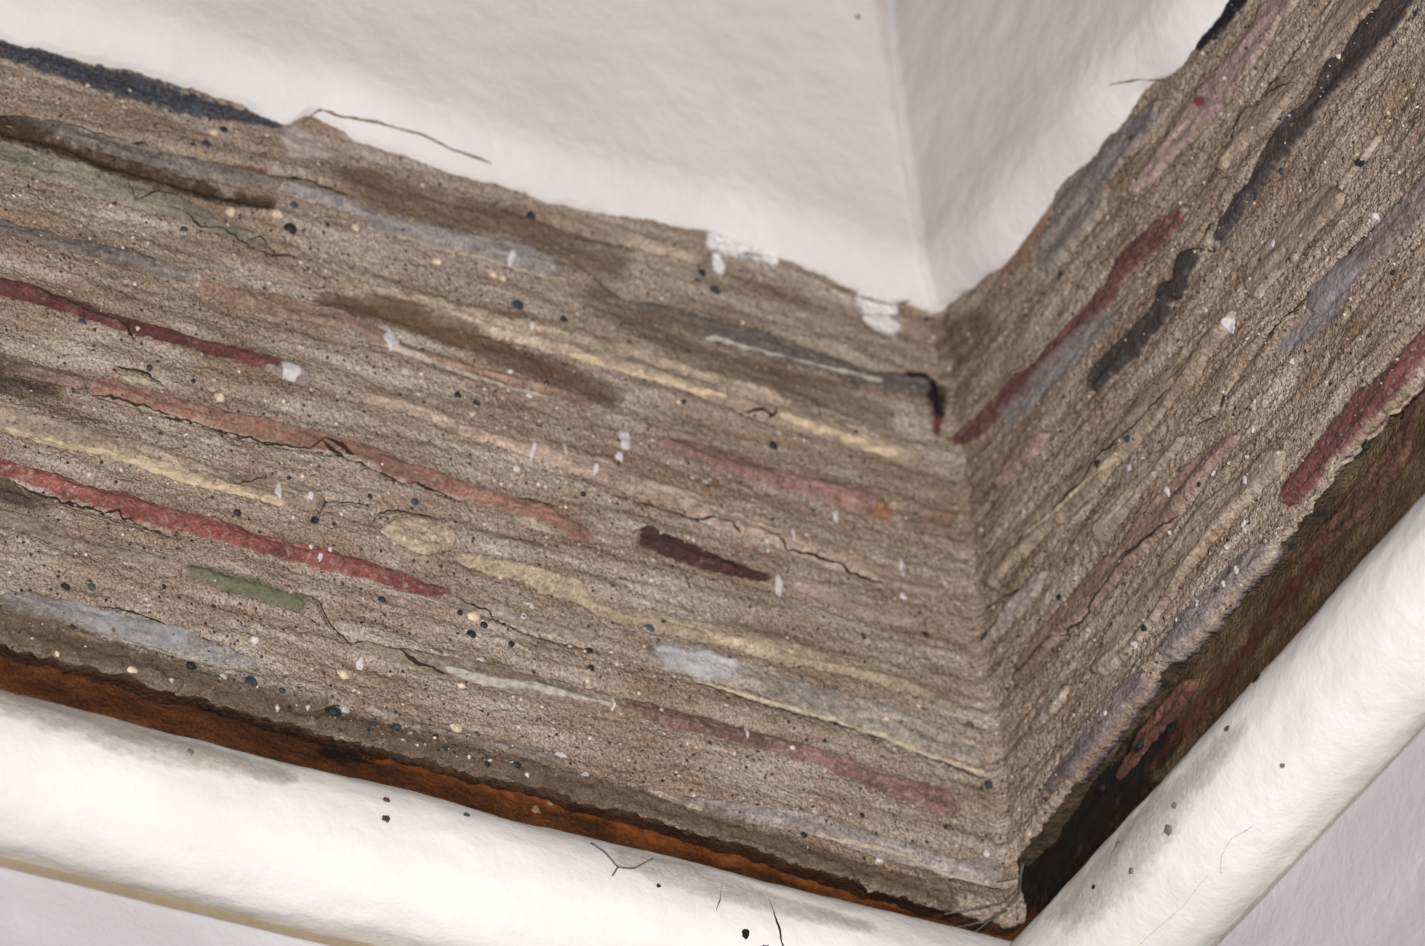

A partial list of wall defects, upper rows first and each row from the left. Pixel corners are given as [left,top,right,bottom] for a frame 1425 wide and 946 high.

spalling [278,124,336,162]
crack [302,108,492,164]
water stain [66,603,324,689]
water stain [445,666,613,707]